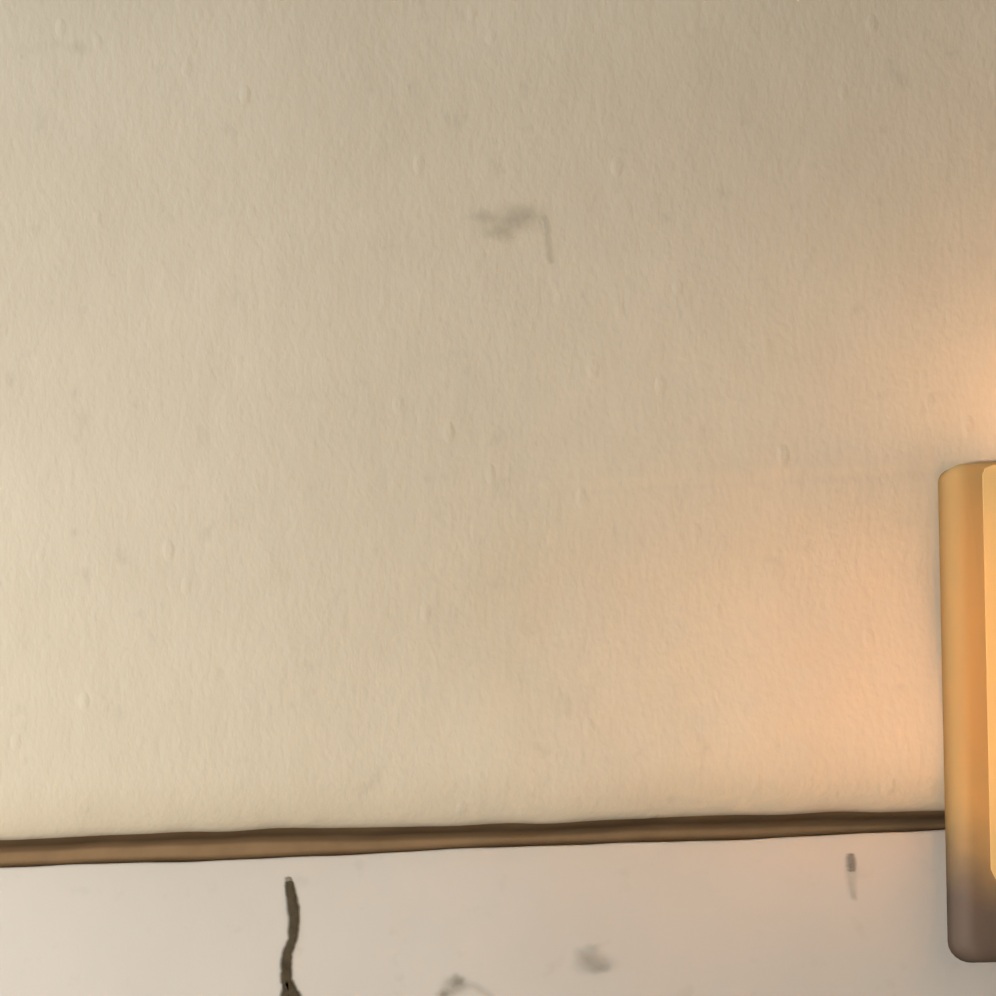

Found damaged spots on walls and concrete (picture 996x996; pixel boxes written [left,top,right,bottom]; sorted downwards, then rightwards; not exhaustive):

crack [280,877,300,996]